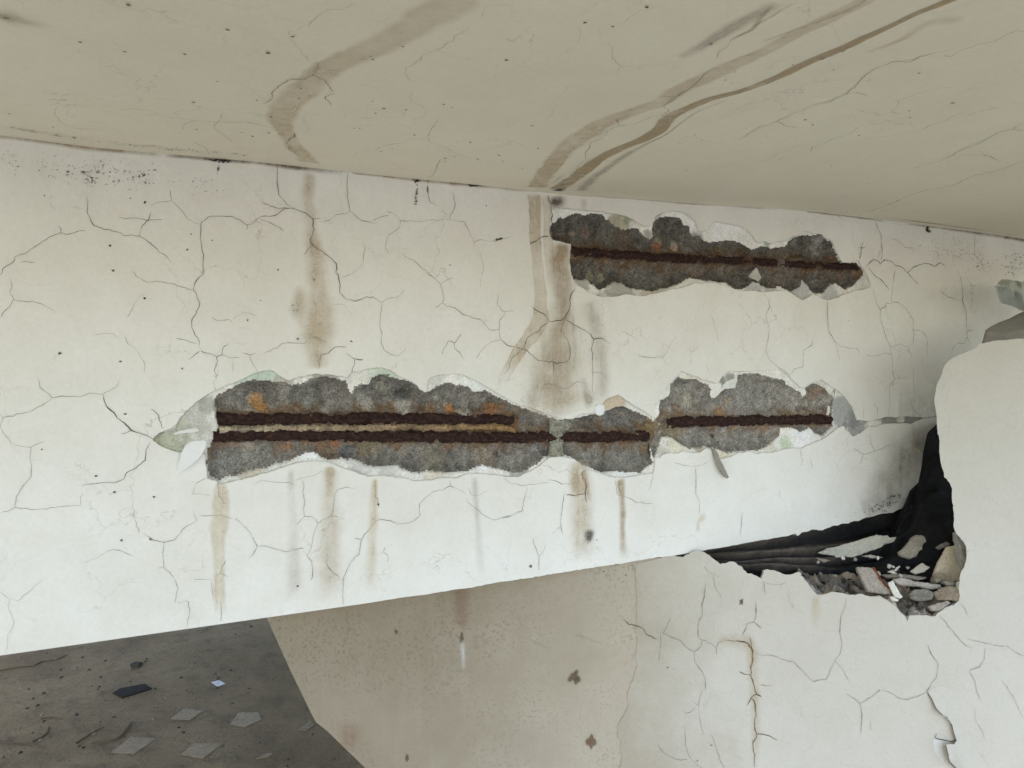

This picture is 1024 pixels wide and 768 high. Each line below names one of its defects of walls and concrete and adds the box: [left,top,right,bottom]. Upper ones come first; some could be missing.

leakage [529,0,955,235]
crack [0,29,747,400]
spalling [549,207,869,300]
corrosion [570,246,859,270]
crack [737,31,1021,464]
crack [0,379,170,512]
corrosion [213,411,650,444]
spalling [153,367,935,484]
corrosion [666,414,834,429]
crack [84,470,587,626]
spalling [797,568,958,618]
crack [623,567,938,767]